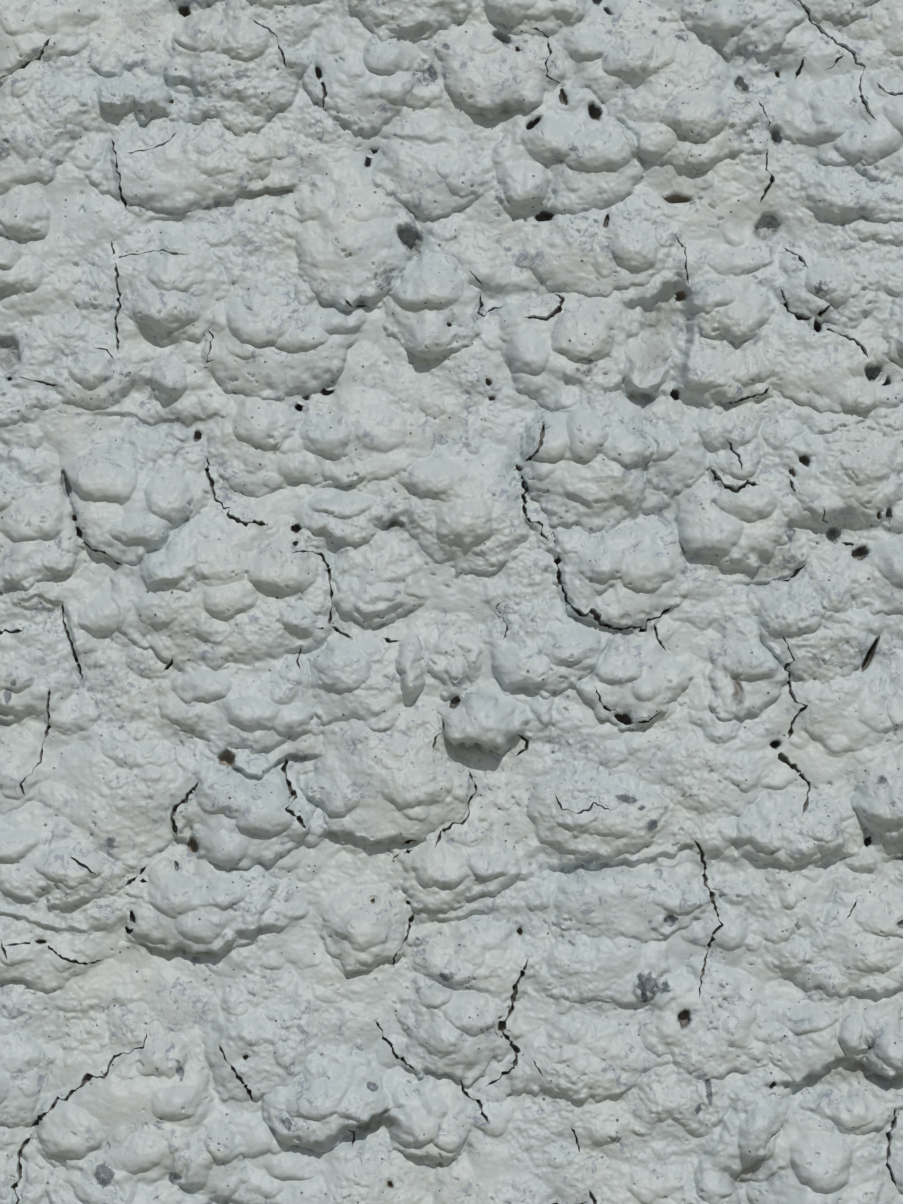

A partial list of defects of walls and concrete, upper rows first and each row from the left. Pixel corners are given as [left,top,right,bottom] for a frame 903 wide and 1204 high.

crack [787,0,903,123]
crack [92,240,187,362]
crack [776,244,872,359]
crack [200,456,267,531]
crack [291,545,402,671]
crack [516,422,674,653]
crack [15,601,87,797]
crack [276,756,310,831]
crack [775,634,815,818]
crack [690,838,728,999]
crack [6,1030,152,1204]
crack [455,956,547,1124]